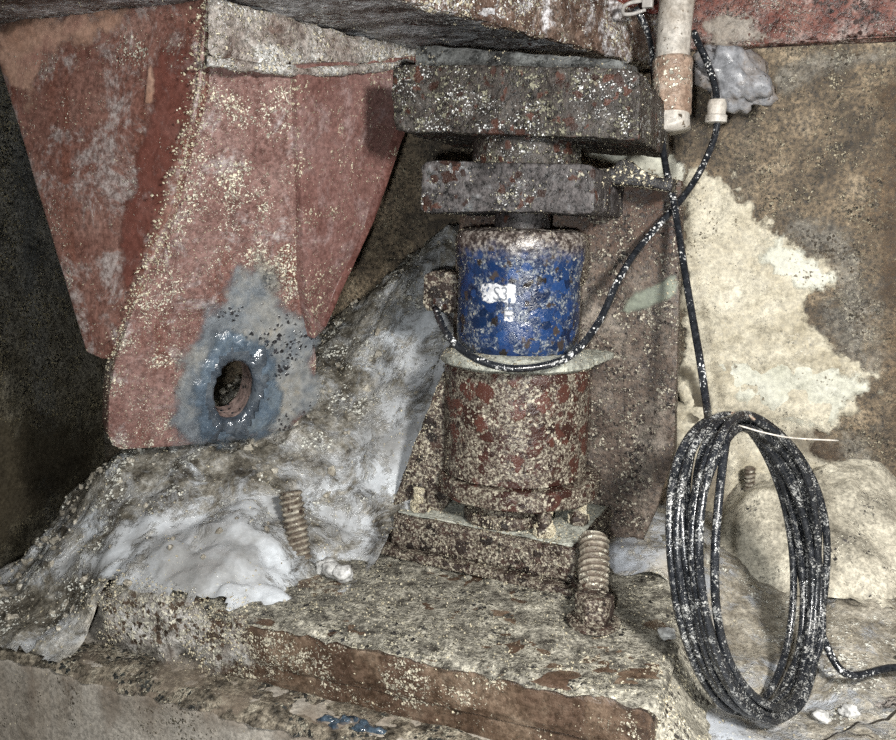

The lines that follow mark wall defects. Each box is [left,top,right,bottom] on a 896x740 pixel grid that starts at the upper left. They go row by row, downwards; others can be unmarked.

corrosion [617,0,659,14]